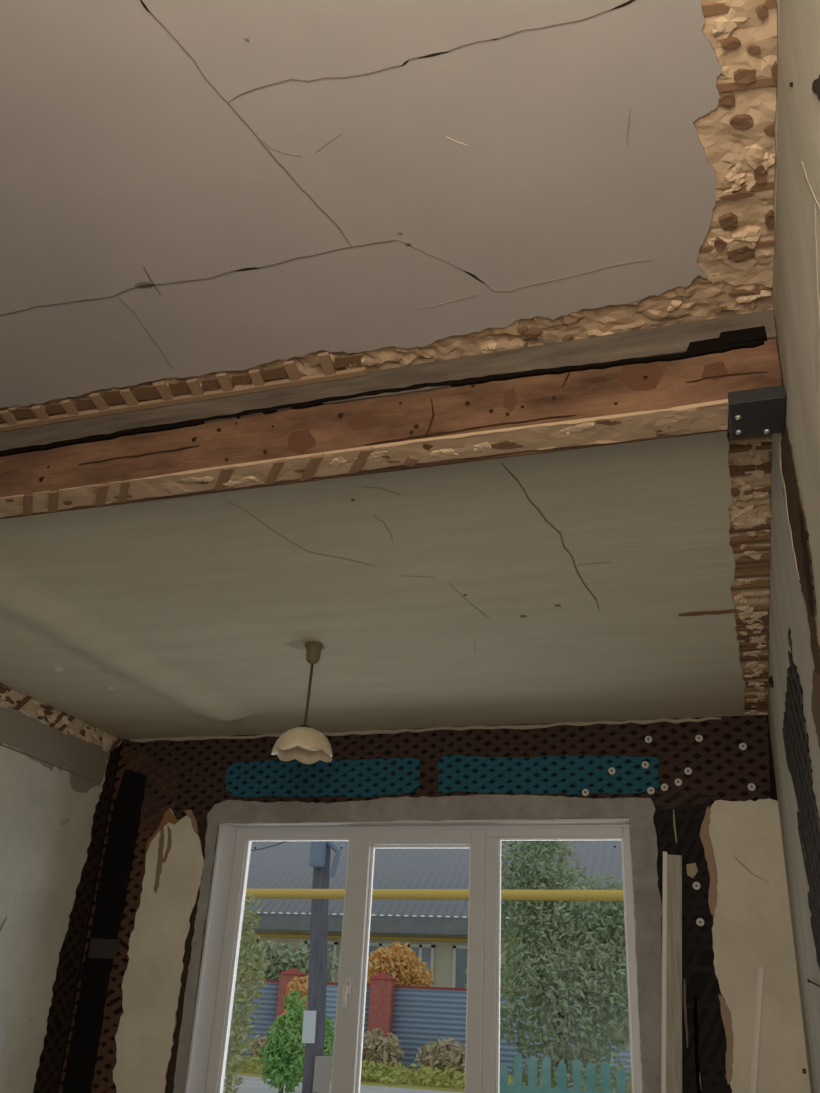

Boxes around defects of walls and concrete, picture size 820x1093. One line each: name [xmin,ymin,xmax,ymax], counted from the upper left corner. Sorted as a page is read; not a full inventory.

crack [0,0,653,370]
spalling [0,0,778,432]
crack [365,398,576,446]
crack [226,500,376,567]
crack [501,463,610,610]
spalling [727,431,774,714]
peeling [0,683,122,793]
flaking render [225,757,421,798]
flaking render [437,754,660,795]
spalling [700,806,718,916]
spalling [165,877,202,1093]
spalling [718,994,734,1085]